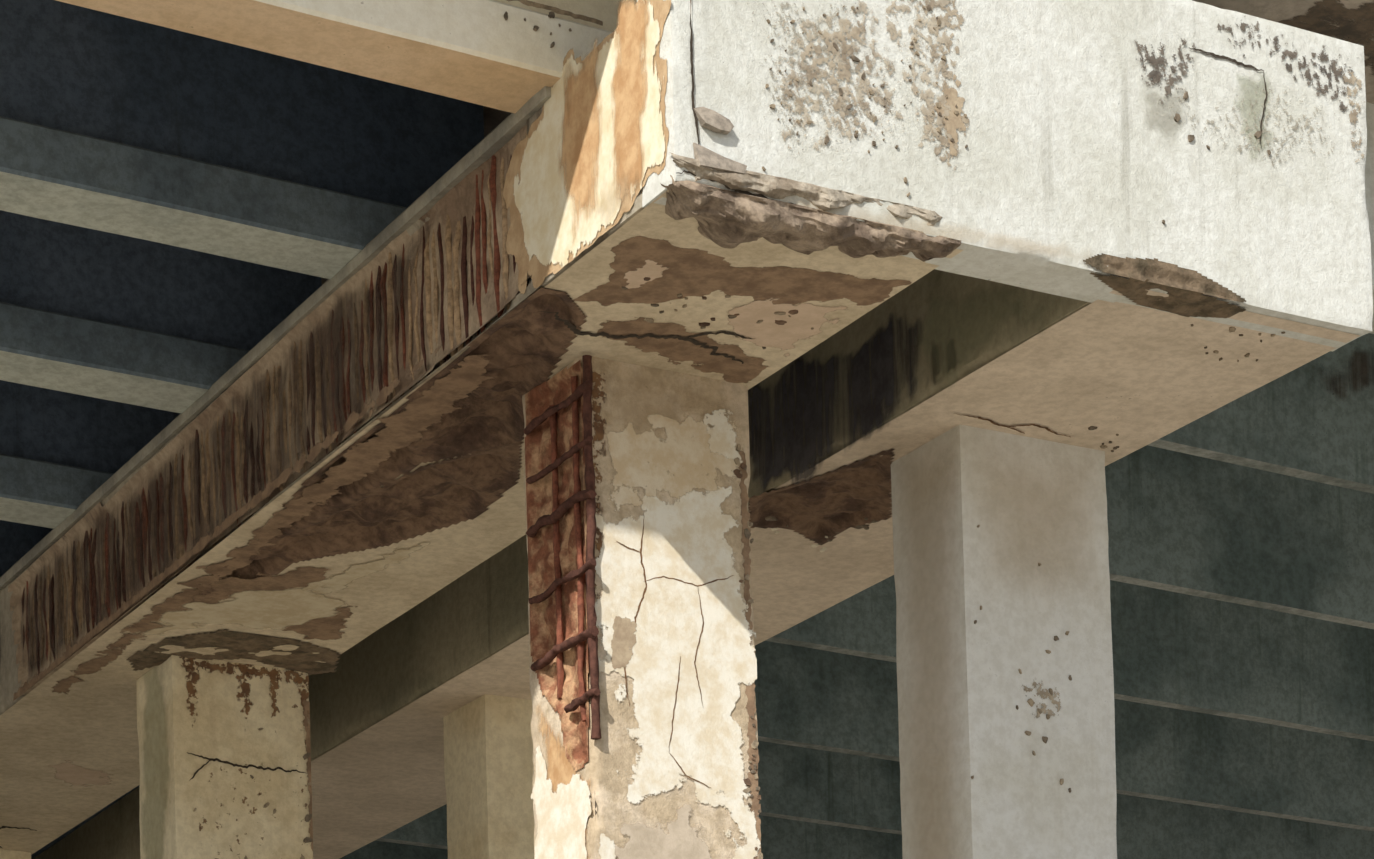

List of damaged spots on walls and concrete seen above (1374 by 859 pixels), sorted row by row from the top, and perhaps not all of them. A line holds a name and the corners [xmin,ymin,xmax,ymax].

crack [1190,48,1267,149]
mould [1217,0,1374,162]
crack [539,311,752,364]
water stain [22,256,411,677]
rust [52,343,496,694]
spalling [8,0,970,859]
rust [180,656,309,726]
crack [187,752,308,781]
crack [617,519,734,788]